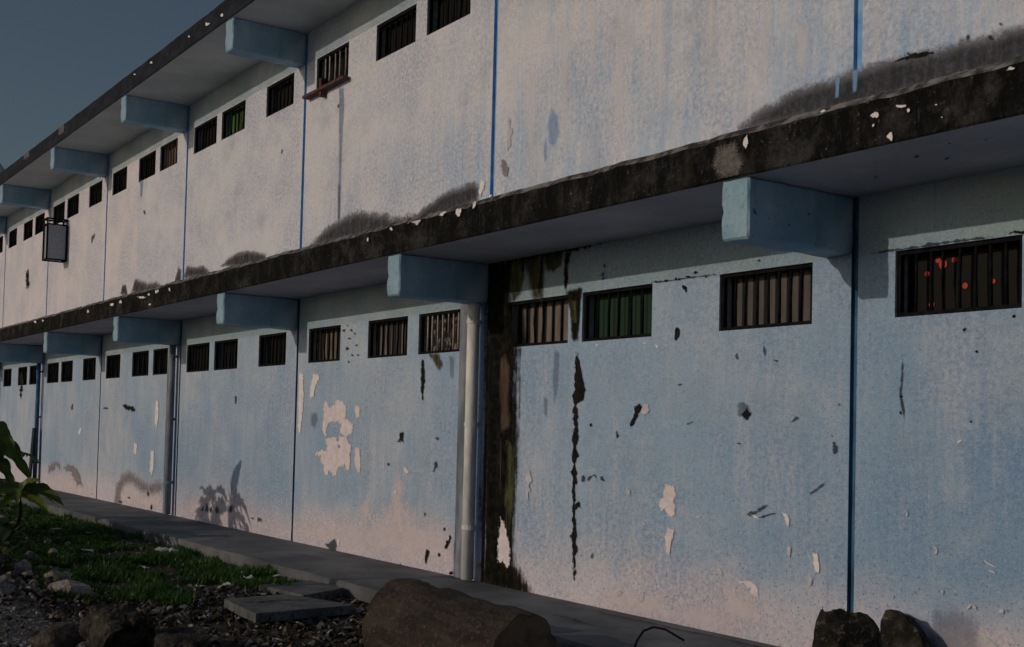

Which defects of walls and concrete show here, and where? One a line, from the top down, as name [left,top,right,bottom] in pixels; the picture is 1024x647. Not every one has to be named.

damp [714,22,1024,177]
damp [310,180,492,245]
mould [121,279,161,295]
mould [175,266,209,281]
mould [222,251,266,267]
crack [871,230,1024,254]
peeling [298,372,361,477]
damp [479,242,606,593]
damp [47,461,91,495]
damp [114,474,161,511]
peeling [659,484,677,557]